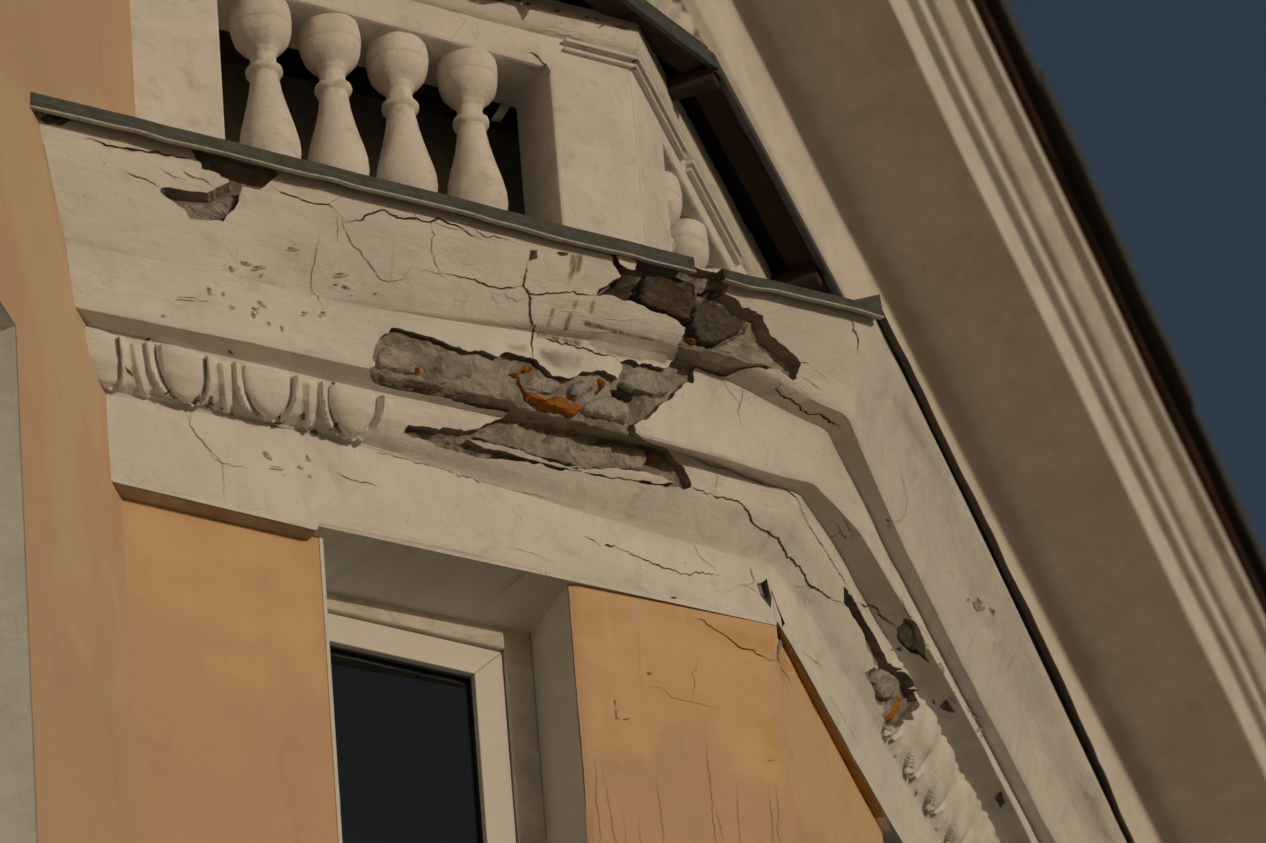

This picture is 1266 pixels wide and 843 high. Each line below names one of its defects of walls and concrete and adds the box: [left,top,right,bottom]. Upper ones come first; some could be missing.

crack [88,138,214,187]
spalling [160,148,277,222]
crack [273,187,641,360]
crack [111,383,333,496]
spalling [369,254,801,489]
crack [775,362,839,427]
crack [379,452,925,632]
spalling [757,578,785,666]
crack [697,618,857,741]
spalling [844,587,983,737]